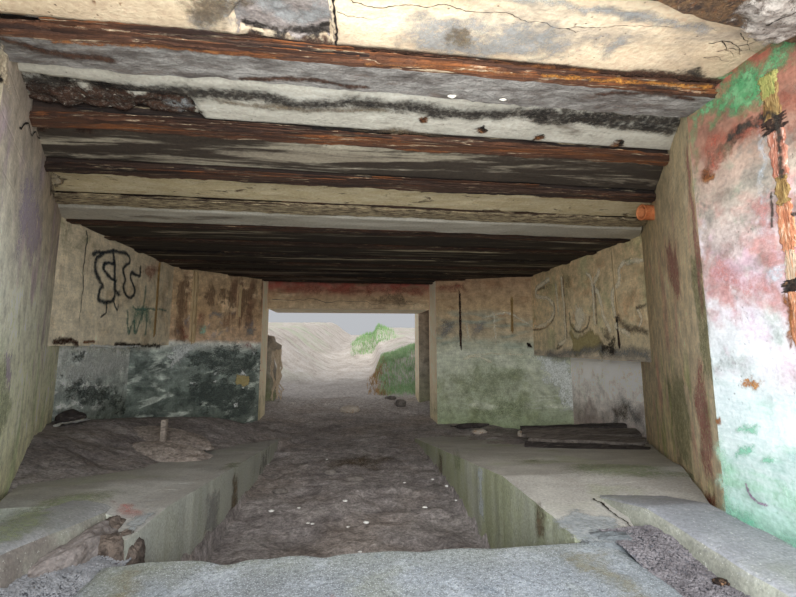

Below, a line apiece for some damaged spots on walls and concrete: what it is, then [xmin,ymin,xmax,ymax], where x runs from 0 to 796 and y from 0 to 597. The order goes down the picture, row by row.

spalling [229,0,335,41]
crack [332,0,672,46]
crack [692,26,752,62]
spalling [731,0,796,45]